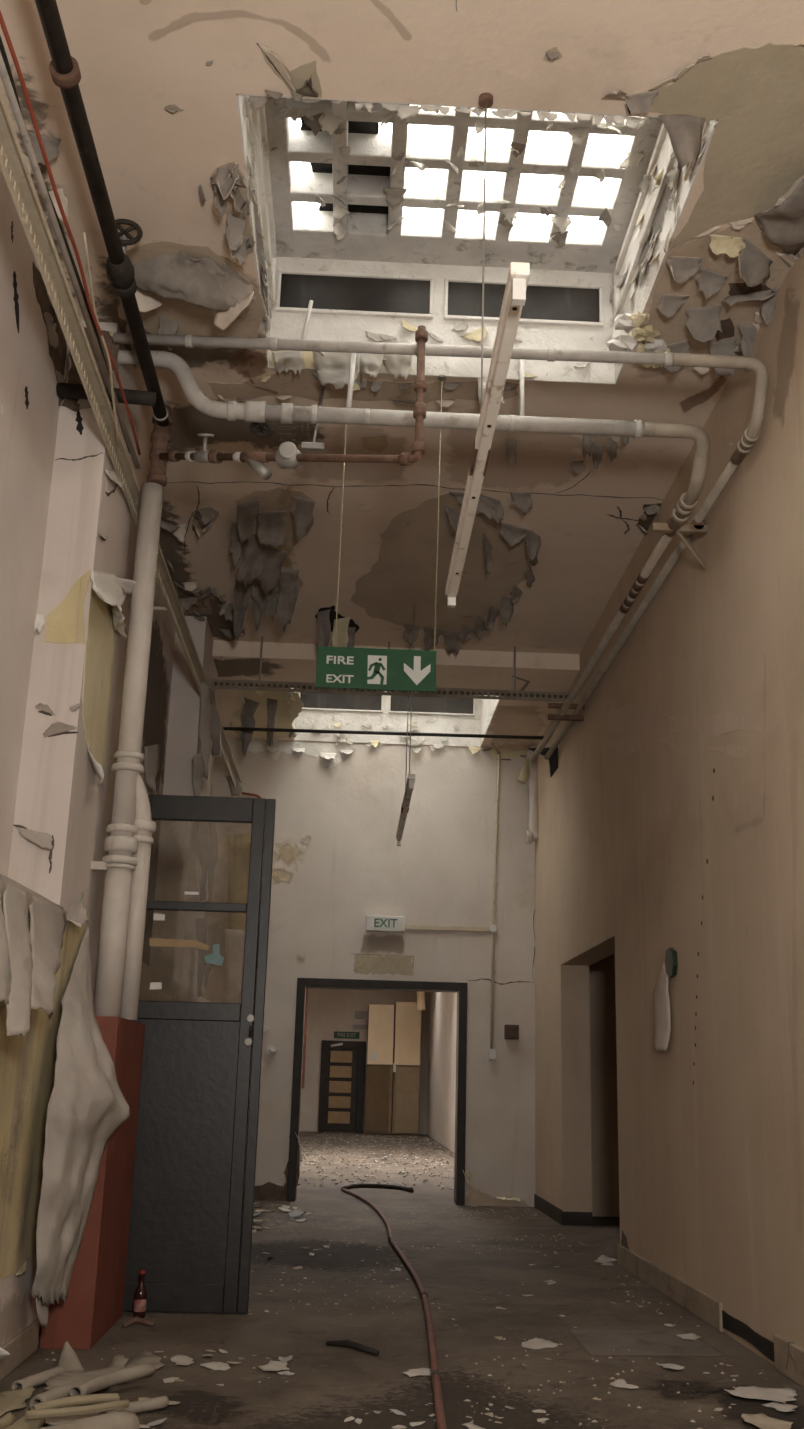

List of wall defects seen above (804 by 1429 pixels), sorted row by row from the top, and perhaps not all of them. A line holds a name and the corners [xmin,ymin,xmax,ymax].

peeling [32,42,804,412]
flaking render [45,570,117,768]
peeling [191,487,315,640]
peeling [315,491,541,655]
flaking render [0,900,90,1279]